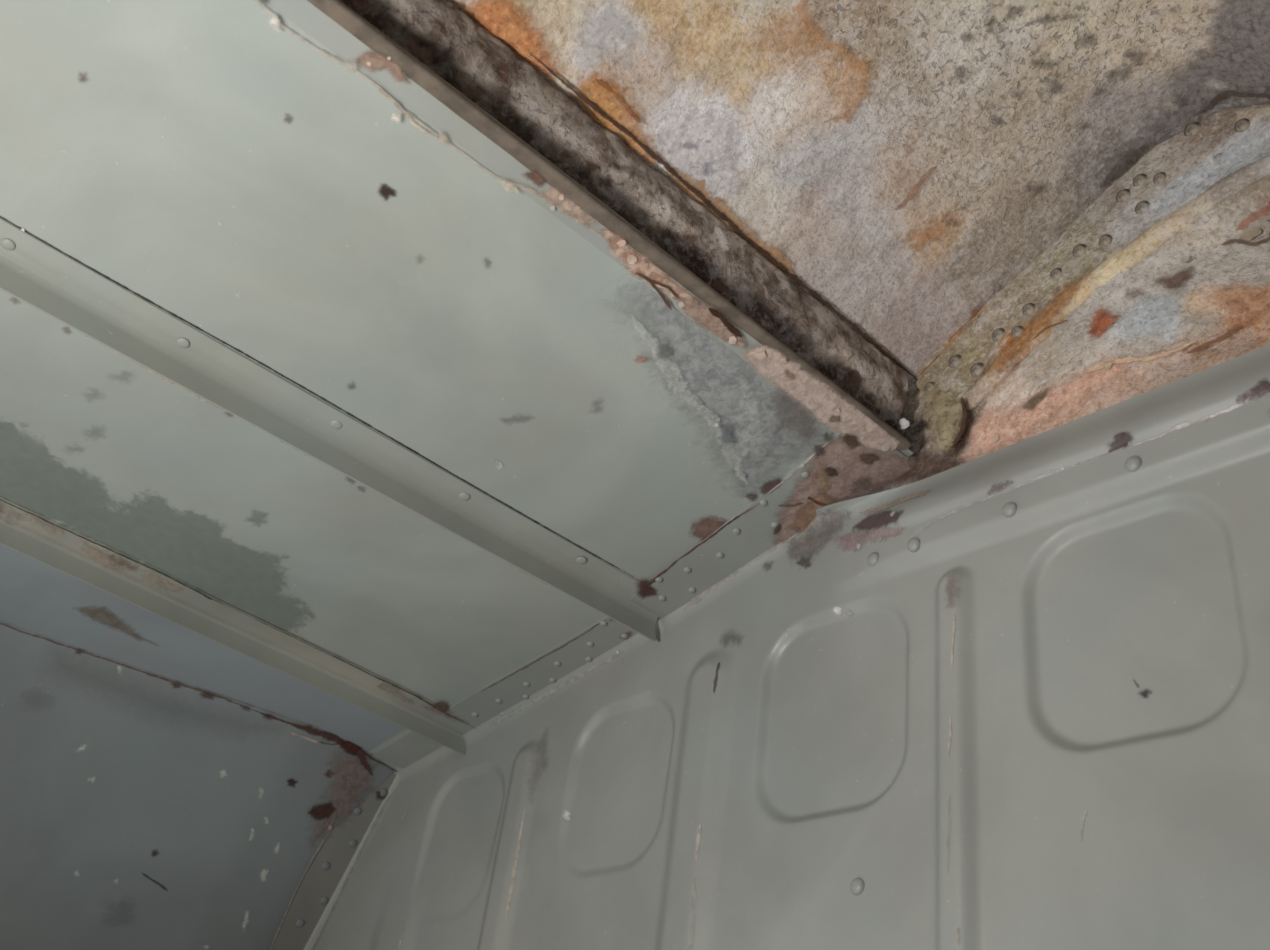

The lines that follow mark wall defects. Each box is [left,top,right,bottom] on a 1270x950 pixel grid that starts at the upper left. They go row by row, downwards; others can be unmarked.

rust [471,0,553,81]
rust [379,185,395,199]
rust [1236,203,1270,231]
rust [1088,310,1117,336]
peeling [678,298,910,464]
rust [638,409,971,598]
rust [0,623,398,839]